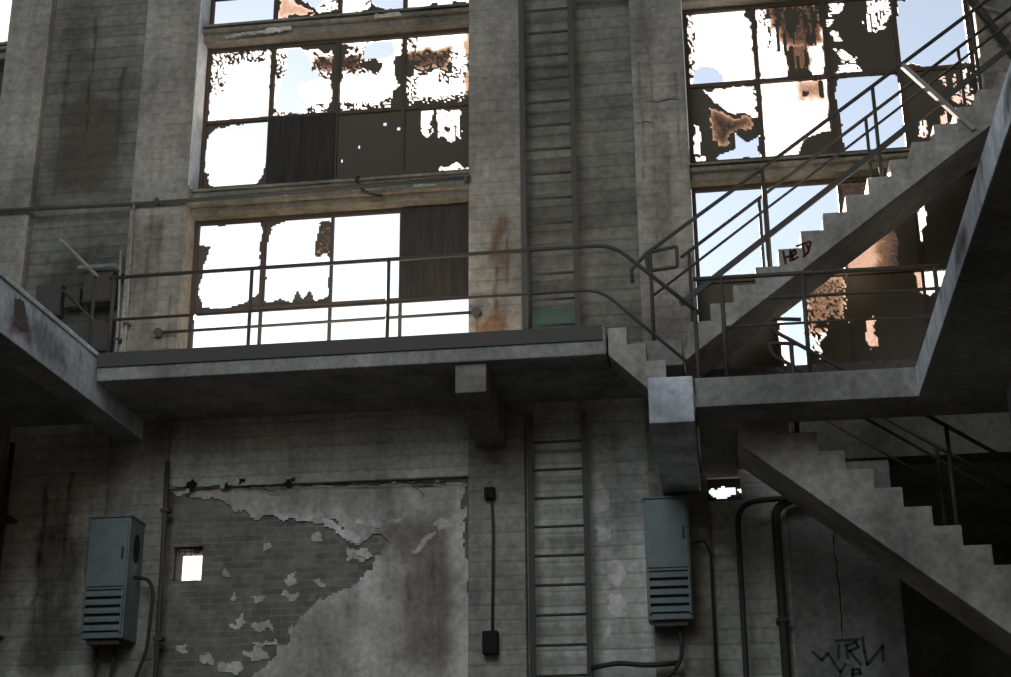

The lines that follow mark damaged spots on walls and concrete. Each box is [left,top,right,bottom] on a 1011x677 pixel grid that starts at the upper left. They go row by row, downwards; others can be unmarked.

corrosion [477,313,505,332]
flaking render [169,477,468,677]